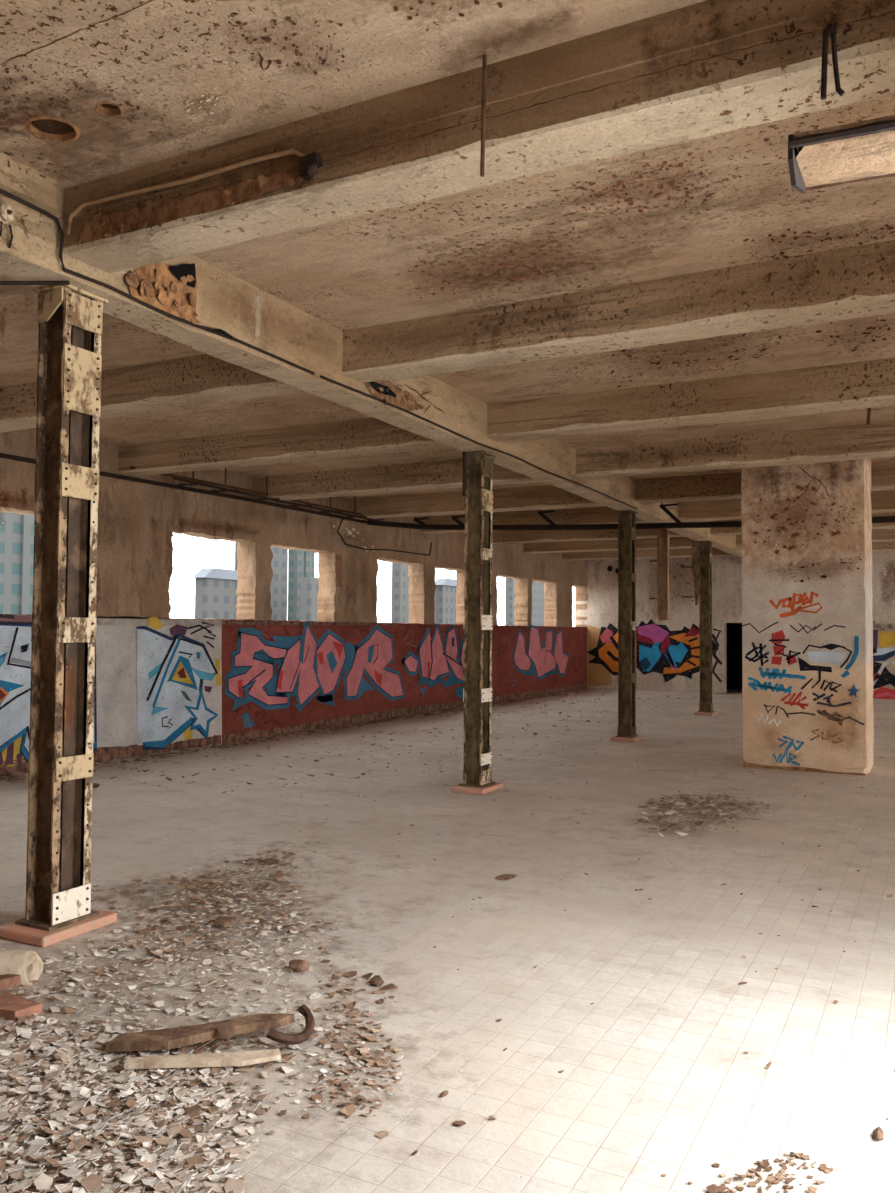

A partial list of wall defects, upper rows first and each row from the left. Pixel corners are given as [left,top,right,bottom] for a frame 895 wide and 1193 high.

spalling [80,172,296,244]
spalling [125,262,238,341]
peeling [751,485,855,582]